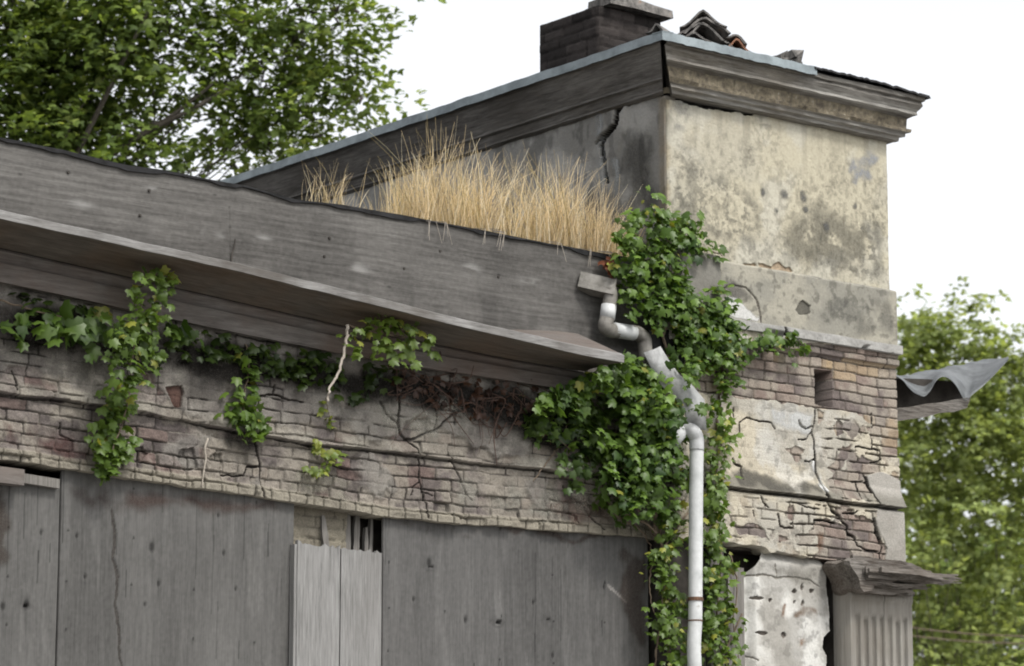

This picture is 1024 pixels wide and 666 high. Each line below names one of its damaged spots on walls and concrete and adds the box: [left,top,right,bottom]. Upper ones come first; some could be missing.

crack [600,110,621,183]
spalling [796,301,809,315]
spalling [166,386,182,408]
flaking render [679,340,899,501]
crack [732,407,882,559]
spalling [735,523,787,542]
flaking render [813,511,885,560]
crack [111,509,123,666]